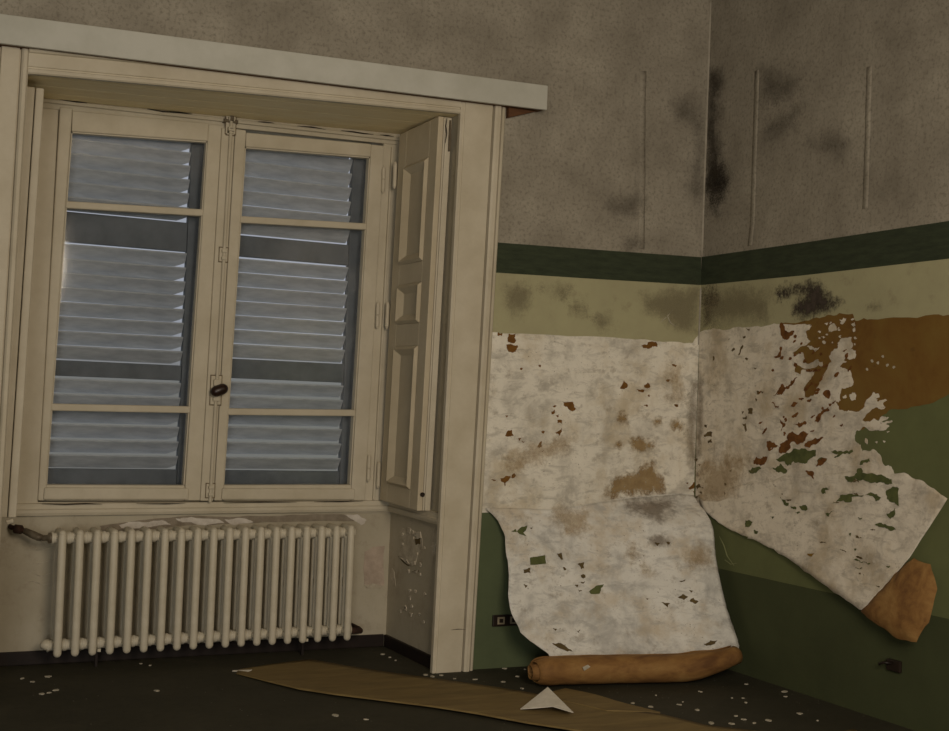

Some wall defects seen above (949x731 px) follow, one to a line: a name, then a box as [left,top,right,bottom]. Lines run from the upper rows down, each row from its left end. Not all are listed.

leakage [707,73,725,195]
leakage [777,279,839,320]
peeling [482,318,899,531]
peeling [524,555,546,588]
peeling [575,562,604,594]